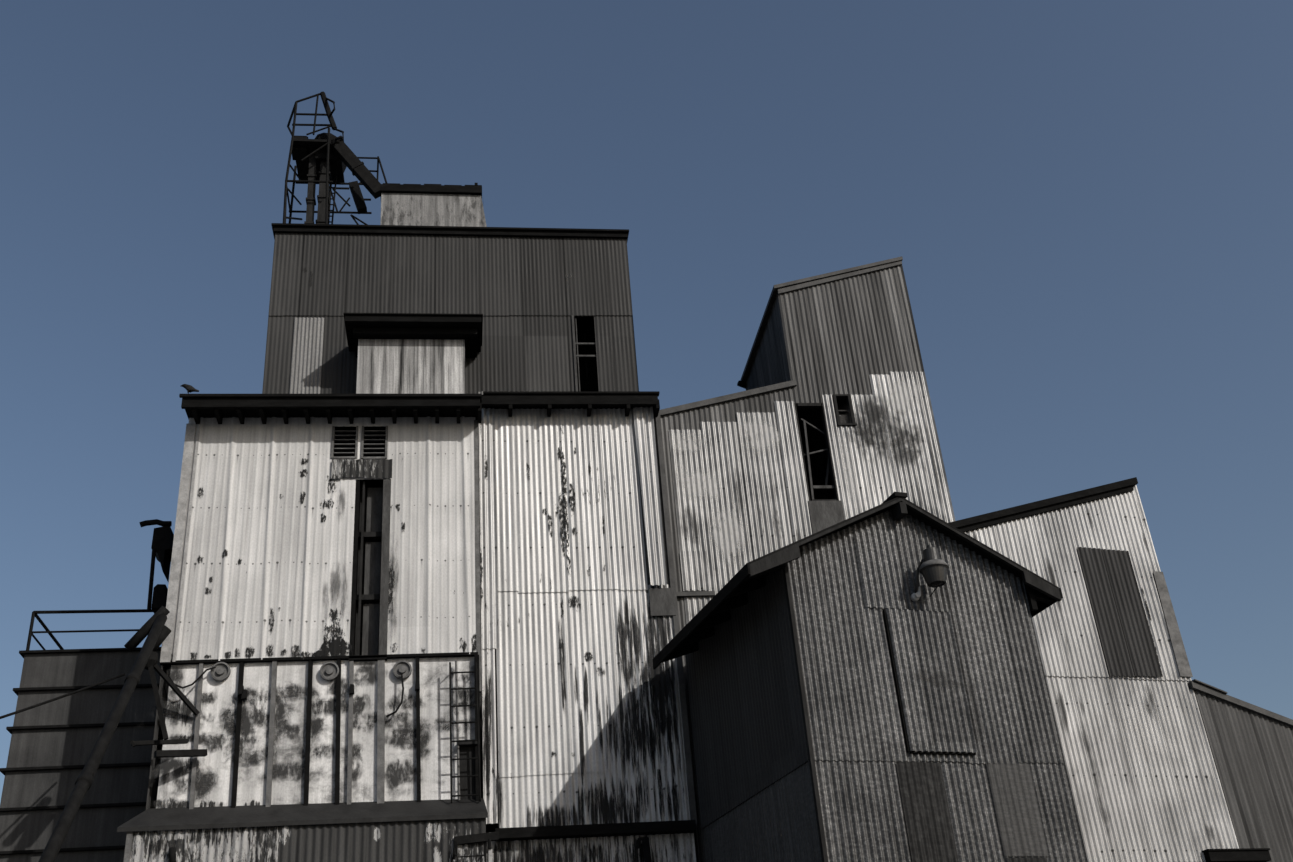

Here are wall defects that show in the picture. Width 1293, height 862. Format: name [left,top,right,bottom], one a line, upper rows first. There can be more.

corrosion [298,459,308,504]
corrosion [320,478,344,523]
corrosion [542,425,605,577]
corrosion [190,574,346,660]
corrosion [388,560,398,623]
corrosion [460,549,483,652]
corrosion [173,700,193,742]
corrosion [482,674,506,825]
corrosion [144,828,216,856]
corrosion [494,841,508,862]